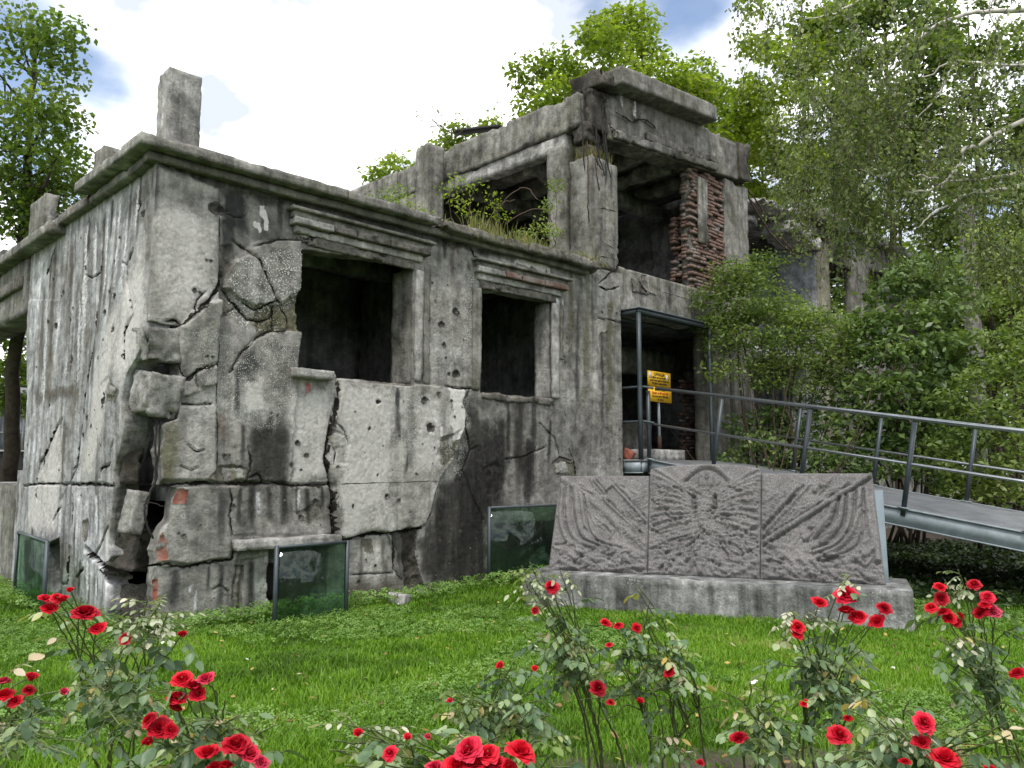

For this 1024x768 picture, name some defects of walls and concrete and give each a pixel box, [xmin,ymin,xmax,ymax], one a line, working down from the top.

crack [63,191,439,592]
damp [232,411,324,523]
damp [419,398,536,587]